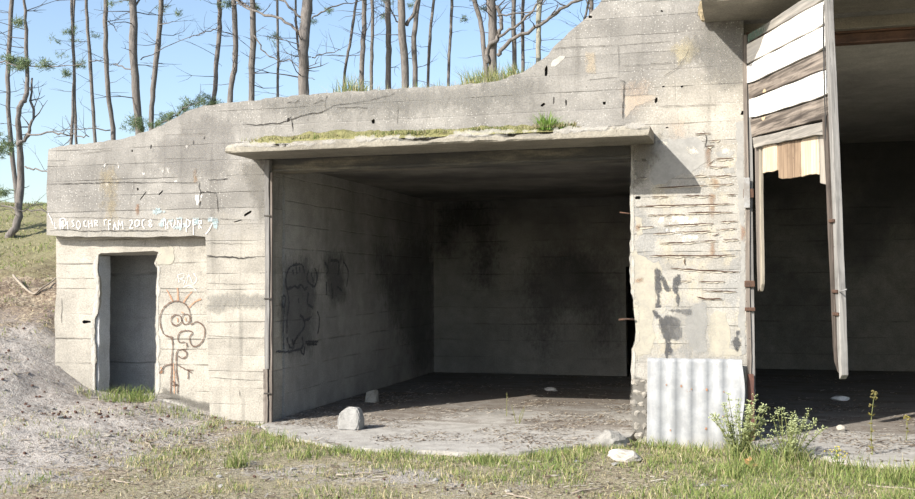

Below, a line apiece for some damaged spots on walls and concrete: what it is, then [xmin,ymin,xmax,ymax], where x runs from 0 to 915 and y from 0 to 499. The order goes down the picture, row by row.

crack [250,93,398,130]
peeling [630,151,662,440]
peeling [646,121,746,357]